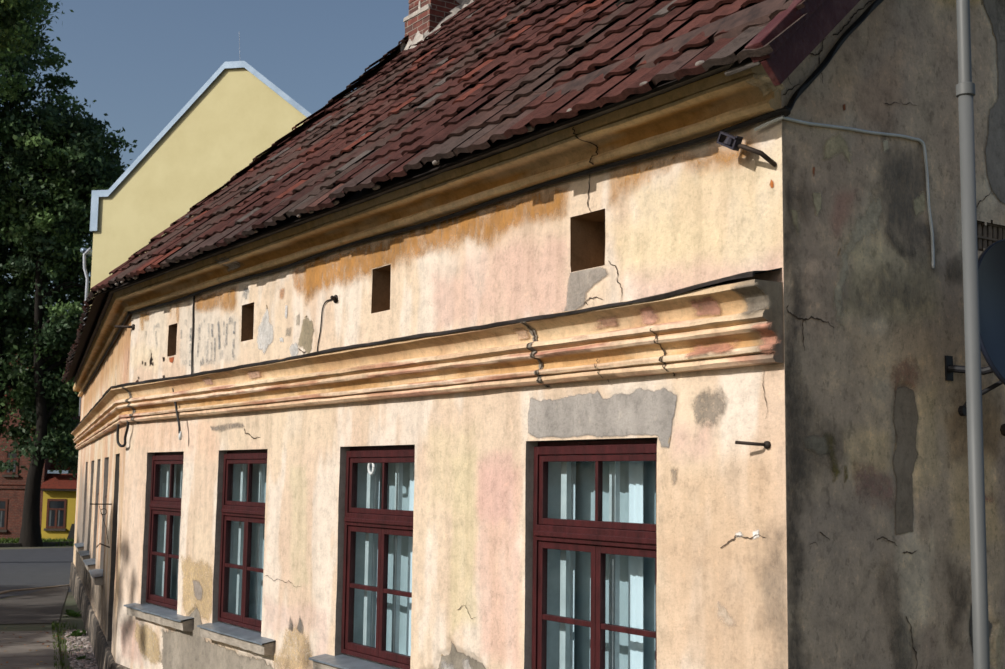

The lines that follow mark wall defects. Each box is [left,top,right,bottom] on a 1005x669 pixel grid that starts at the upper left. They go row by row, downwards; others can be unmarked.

crack [520,321,550,388]
crack [650,328,675,376]
peeling [438,642,485,669]